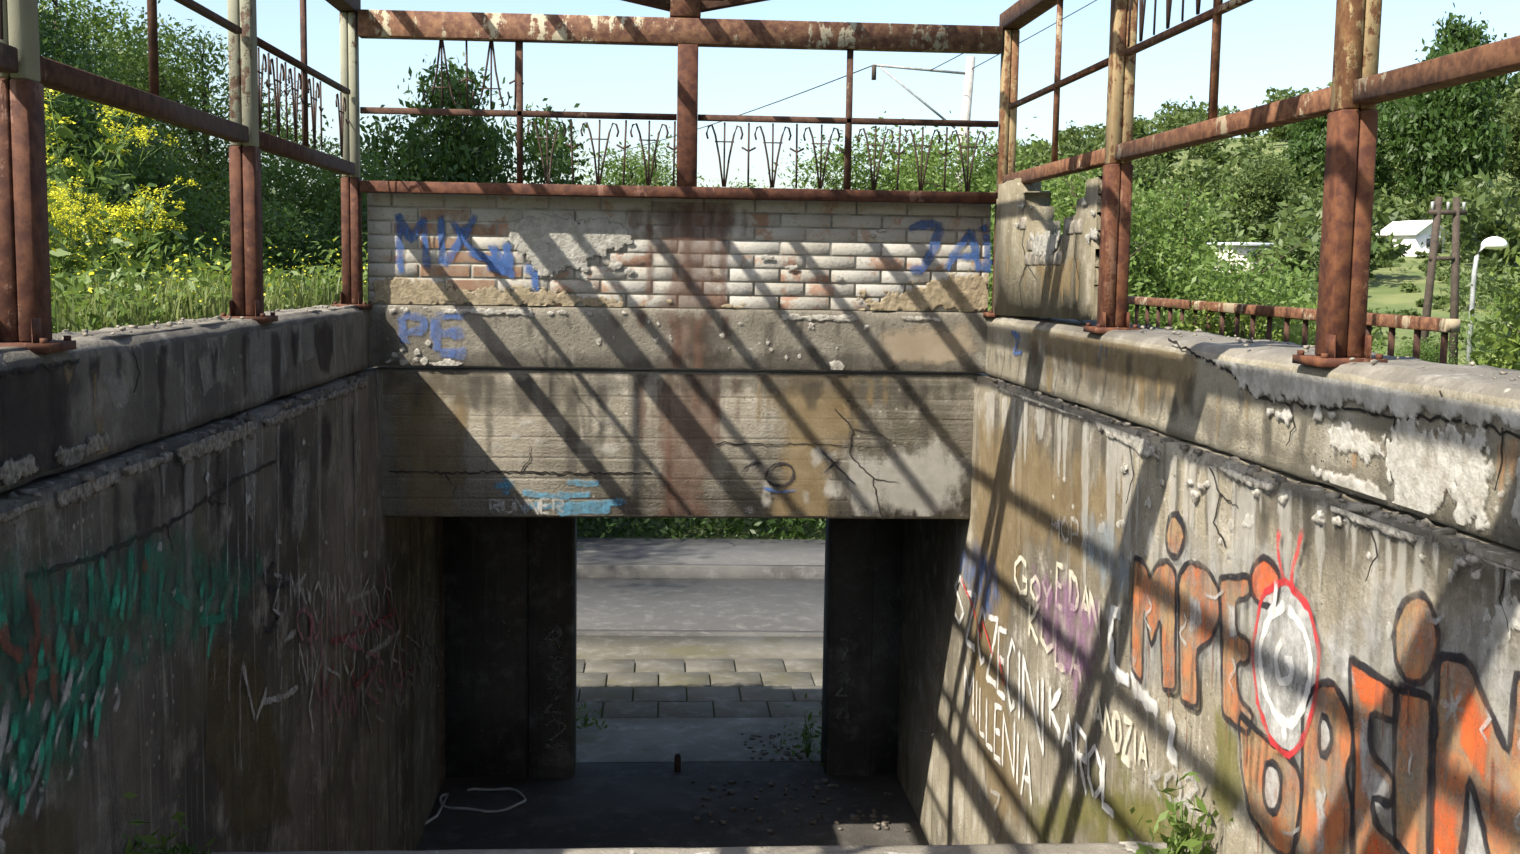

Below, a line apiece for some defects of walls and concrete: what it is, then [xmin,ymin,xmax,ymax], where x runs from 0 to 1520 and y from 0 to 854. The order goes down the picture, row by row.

peeling [370,209,672,343]
peeling [1015,203,1060,261]
spalling [829,347,844,370]
spalling [0,380,367,523]
crack [389,449,651,498]
crack [716,409,900,520]
leakage [767,375,852,516]
spalling [995,386,1159,473]
spalling [1144,466,1288,559]
peeling [1201,357,1520,530]
spalling [1311,505,1421,559]
peeling [1448,553,1520,670]